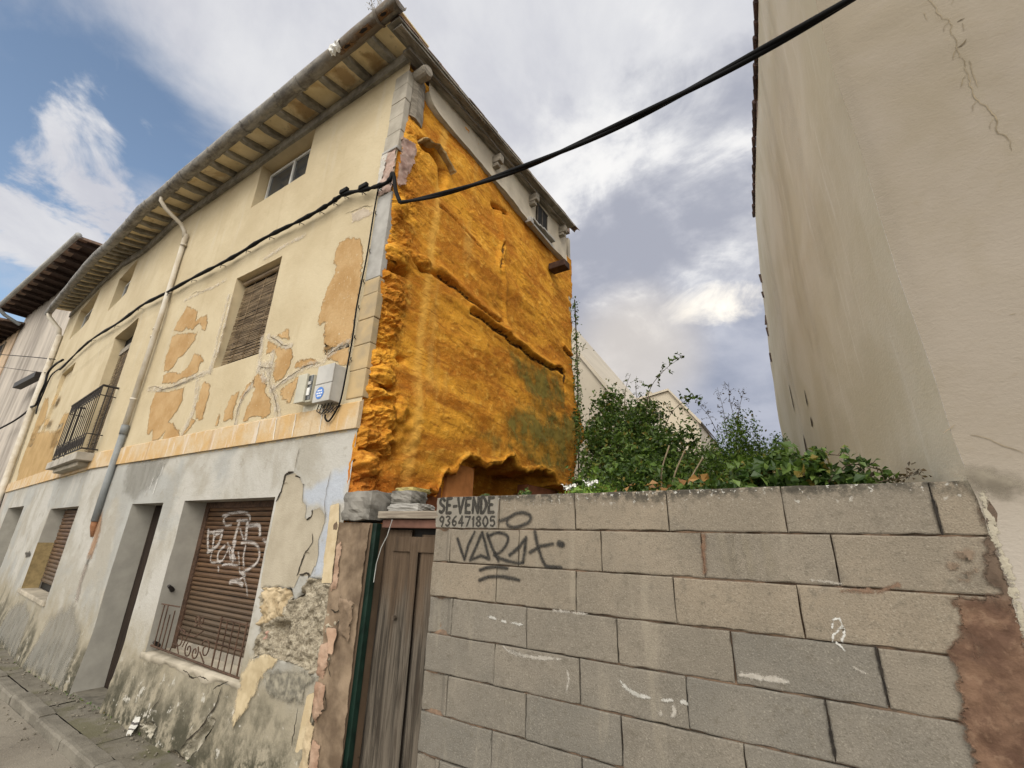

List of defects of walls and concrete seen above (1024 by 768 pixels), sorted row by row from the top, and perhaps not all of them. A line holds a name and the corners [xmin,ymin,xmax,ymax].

crack [924,0,1012,150]
spalling [377,137,417,196]
peeling [16,395,69,481]
peeling [147,306,210,441]
peeling [215,237,364,426]
crack [276,448,331,597]
spalling [426,451,568,511]
spalling [232,473,354,768]